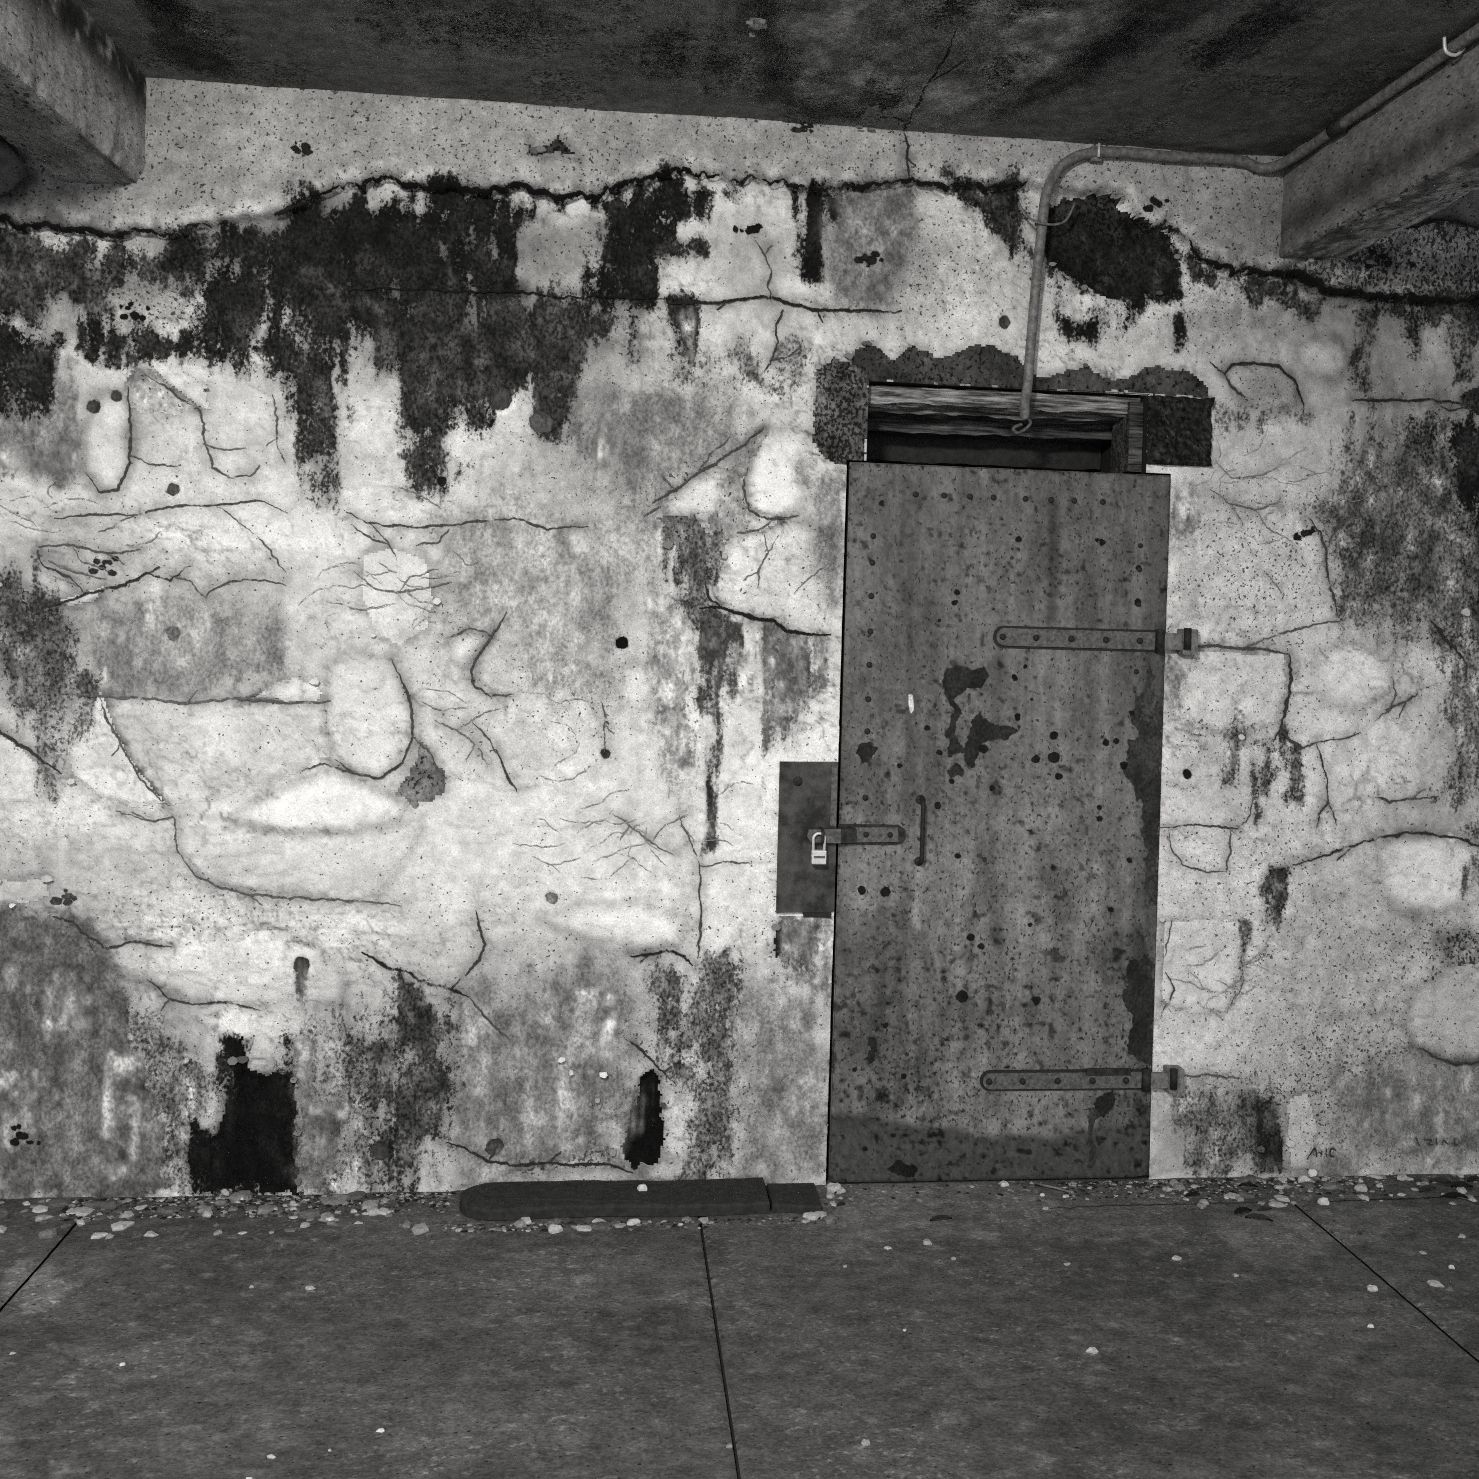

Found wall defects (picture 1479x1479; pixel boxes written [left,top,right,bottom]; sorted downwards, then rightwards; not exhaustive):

crack [0,137,212,239]
spalling [1273,221,1479,311]
crack [0,373,753,966]
leakage [0,159,829,854]
crack [643,426,831,636]
leakage [940,161,1479,898]
crack [1191,361,1479,865]
spalling [10,1124,41,1146]
spalling [175,1036,429,1236]
leakage [0,901,635,1199]
spalling [485,1069,666,1191]
leakage [643,946,831,1186]